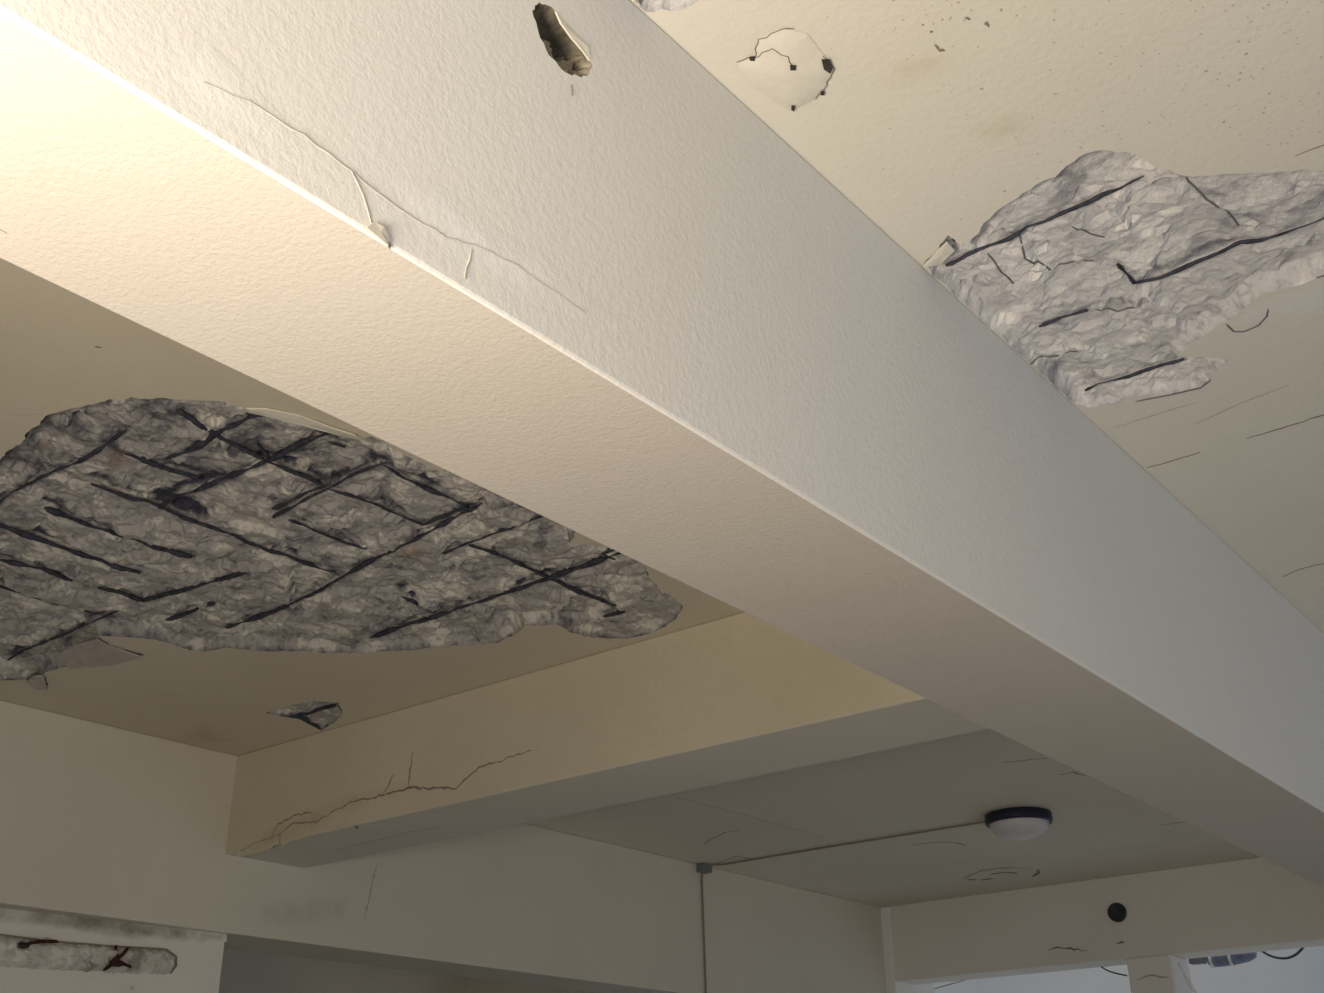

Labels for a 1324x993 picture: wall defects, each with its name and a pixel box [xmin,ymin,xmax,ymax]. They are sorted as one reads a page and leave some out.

spalling [532,3,592,77]
spalling [632,0,699,12]
spalling [923,92,1324,407]
spalling [0,397,683,691]
spalling [267,701,343,731]
crack [240,750,532,851]